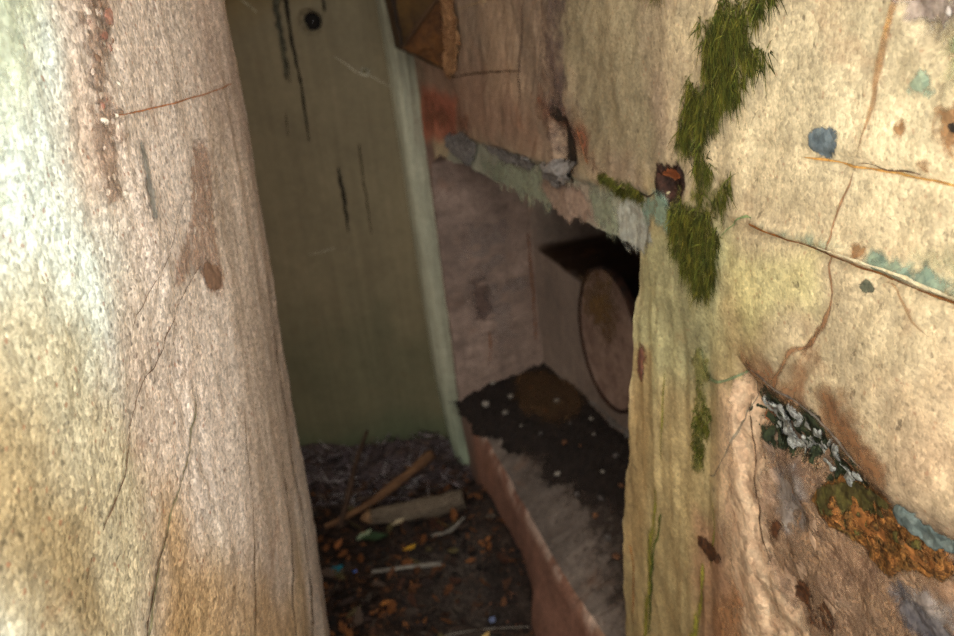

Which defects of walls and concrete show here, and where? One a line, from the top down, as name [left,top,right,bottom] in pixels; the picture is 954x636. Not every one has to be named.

rust [933,108,954,160]
crack [804,157,954,186]
spalling [761,394,929,636]